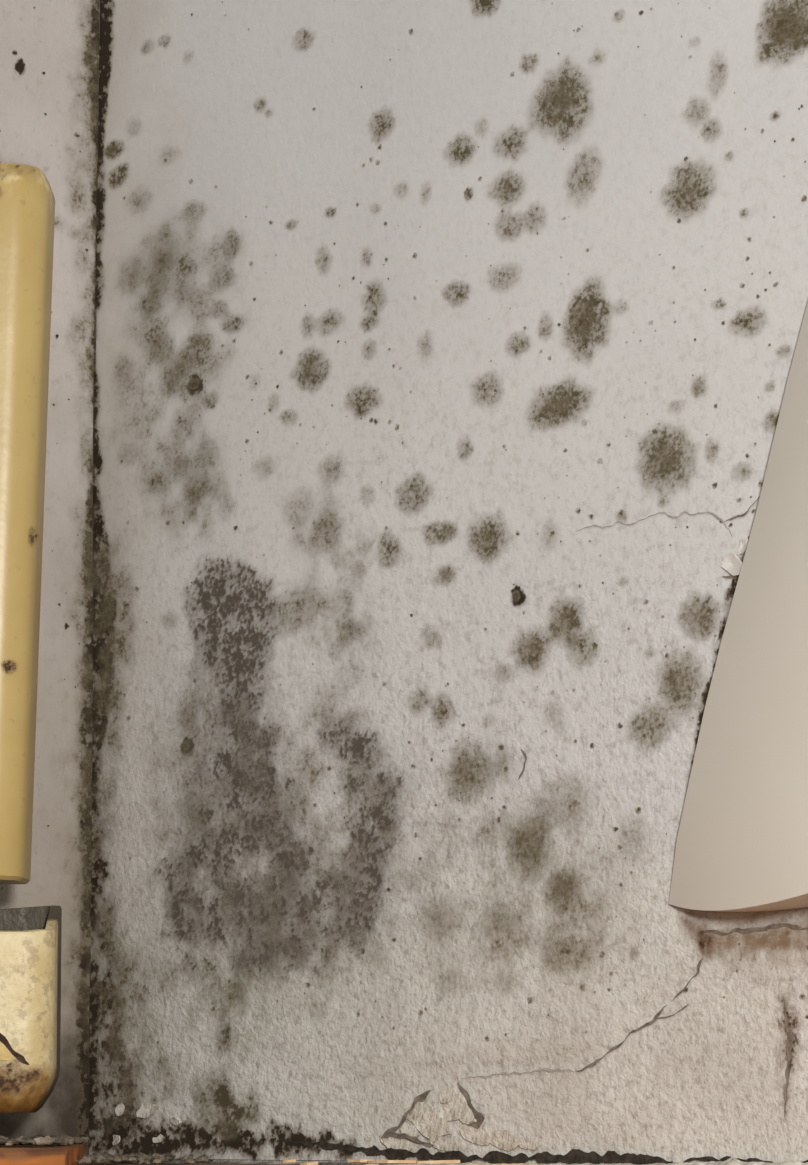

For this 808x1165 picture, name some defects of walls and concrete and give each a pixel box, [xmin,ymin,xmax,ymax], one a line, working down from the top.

mould [759,0,808,61]
water stain [496,52,589,158]
water stain [540,283,622,359]
water stain [530,382,590,429]
mould [640,423,693,504]
crack [580,496,760,535]
water stain [58,0,356,1160]
water stain [511,584,526,615]
mould [518,601,597,669]
water stain [618,576,739,765]
peeling [721,539,749,578]
mould [155,558,403,1011]